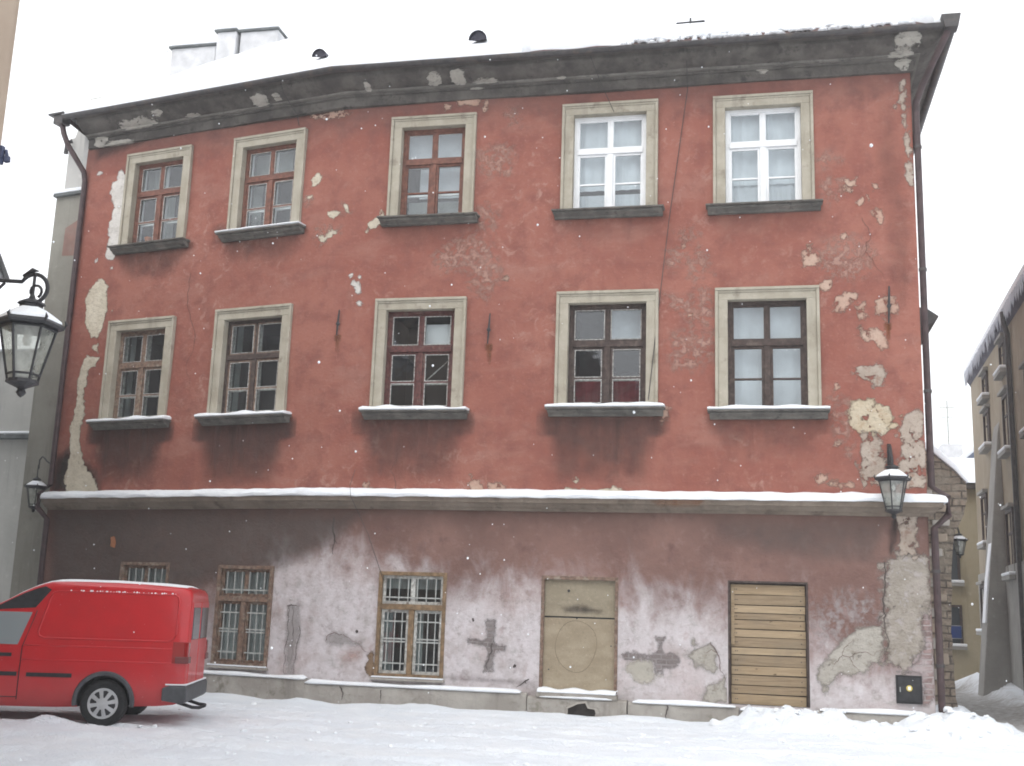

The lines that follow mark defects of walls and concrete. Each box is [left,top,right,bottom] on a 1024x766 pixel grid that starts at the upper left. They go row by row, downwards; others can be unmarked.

flaking render [888,31,922,186]
peeling [302,173,322,202]
peeling [315,204,349,242]
peeling [365,209,384,233]
flaking render [64,170,125,491]
peeling [801,233,899,351]
flaking render [815,363,926,489]
crack [835,562,890,668]
flaking render [816,516,935,705]
flaking render [703,678,727,703]